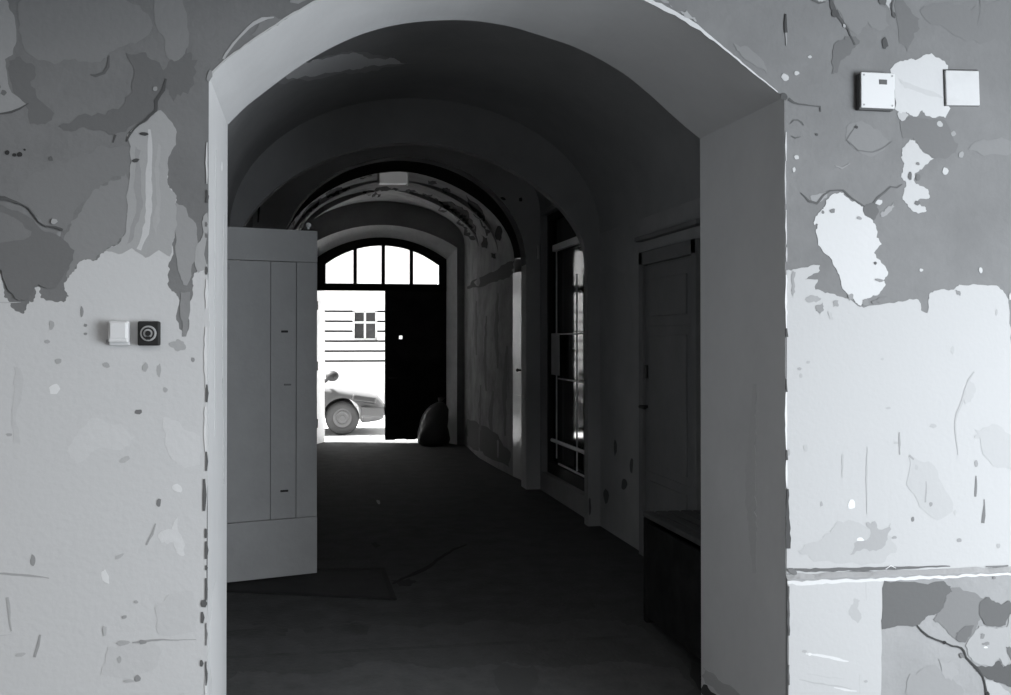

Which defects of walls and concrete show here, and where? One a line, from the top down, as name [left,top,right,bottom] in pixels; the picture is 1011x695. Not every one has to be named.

flaking render [0,0,25,113]
peeling [890,53,956,136]
flaking render [0,142,210,695]
flaking render [785,132,1011,695]
crack [794,564,950,572]
crack [917,625,987,695]